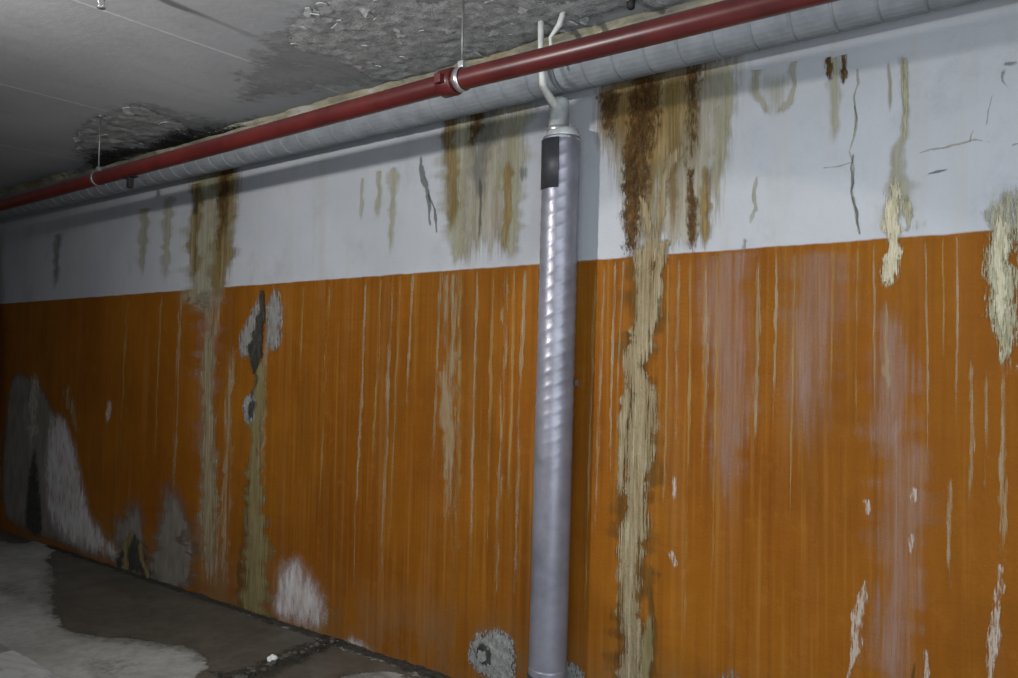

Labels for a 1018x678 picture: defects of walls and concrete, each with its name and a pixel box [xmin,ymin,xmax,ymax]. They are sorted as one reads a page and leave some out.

flaking render [73,106,228,159]
damp [186,168,238,310]
spalling [239,289,283,374]
flaking render [244,0,629,101]
damp [441,103,527,258]
crack [824,69,860,234]
damp [880,58,913,287]
damp [981,188,1018,368]
peeling [2,374,197,588]
damp [47,326,449,678]
damp [610,224,676,678]
spalling [468,628,517,678]